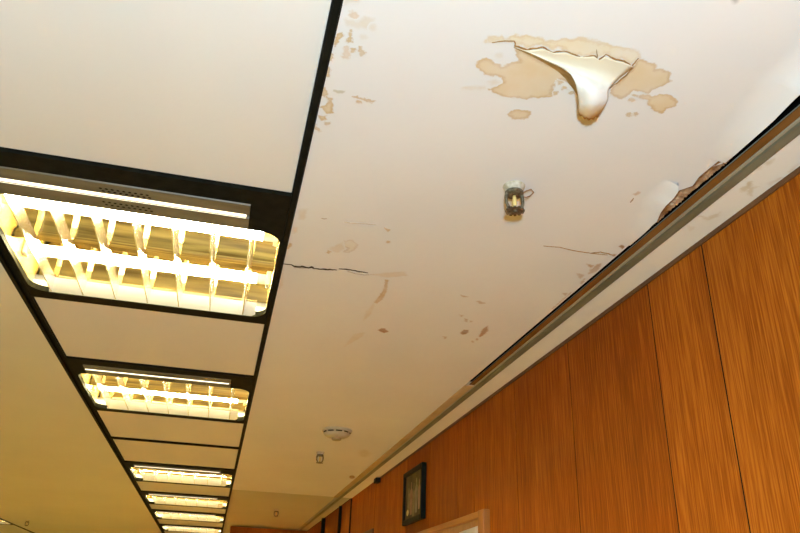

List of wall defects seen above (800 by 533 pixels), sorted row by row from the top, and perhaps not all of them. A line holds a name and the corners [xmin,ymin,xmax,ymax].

peeling [314,0,380,133]
water stain [506,109,532,120]
spalling [615,158,732,246]
crack [285,264,368,275]